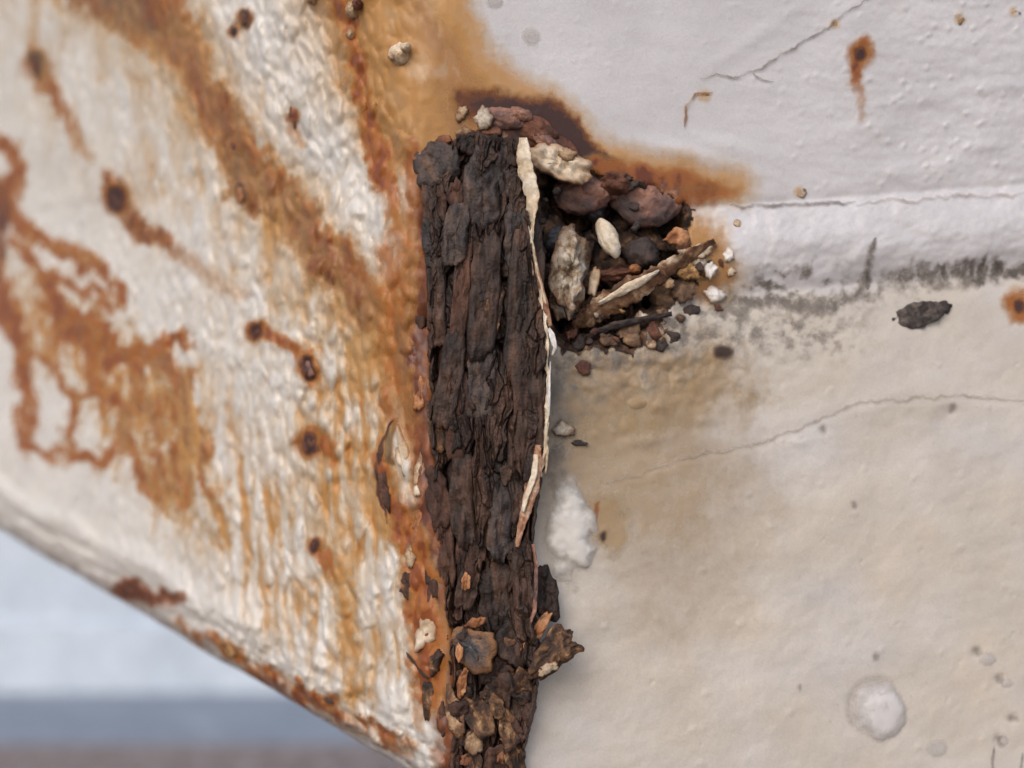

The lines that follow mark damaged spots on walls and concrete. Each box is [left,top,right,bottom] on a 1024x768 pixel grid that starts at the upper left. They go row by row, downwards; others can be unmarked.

crack [684,0,865,127]
corrosion [848,37,873,90]
corrosion [0,0,748,768]
spalling [434,105,737,624]
damp [547,334,756,550]
damp [713,293,871,314]
damp [888,255,1024,290]
corrosion [1005,290,1024,321]